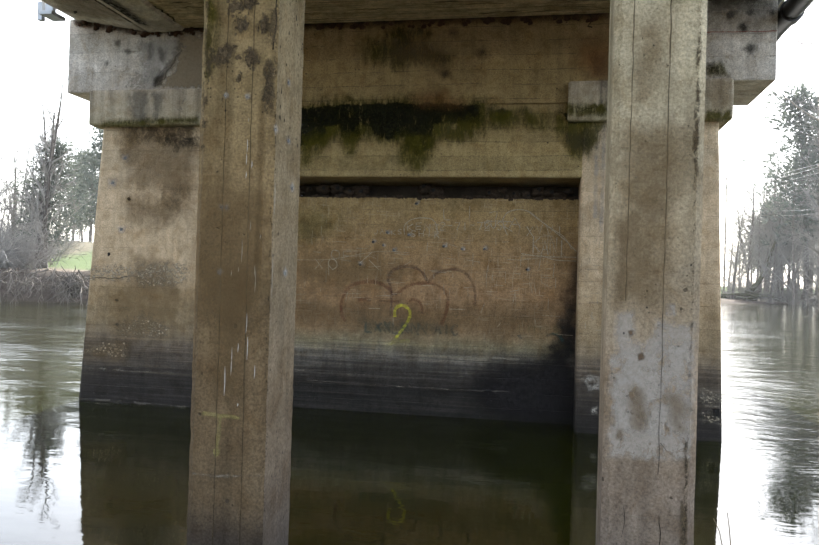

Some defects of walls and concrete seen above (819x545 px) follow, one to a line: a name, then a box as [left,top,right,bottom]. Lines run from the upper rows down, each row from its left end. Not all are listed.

damp [567,103,607,117]
damp [707,110,731,121]
damp [371,116,433,154]
crack [659,0,672,423]
damp [473,273,577,425]